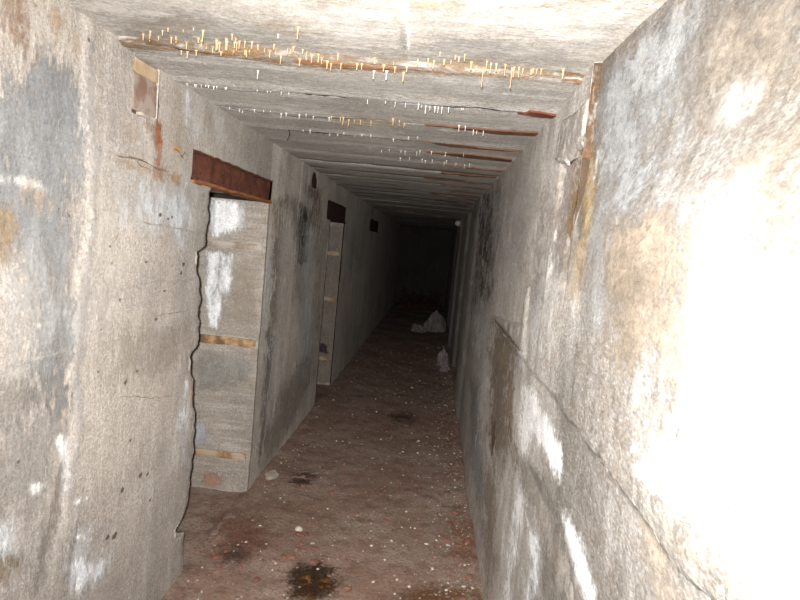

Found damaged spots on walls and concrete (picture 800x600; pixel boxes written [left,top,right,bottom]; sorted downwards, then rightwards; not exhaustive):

corrosion [121,37,178,50]
corrosion [190,43,546,78]
corrosion [153,120,163,178]
leakage [79,0,800,384]